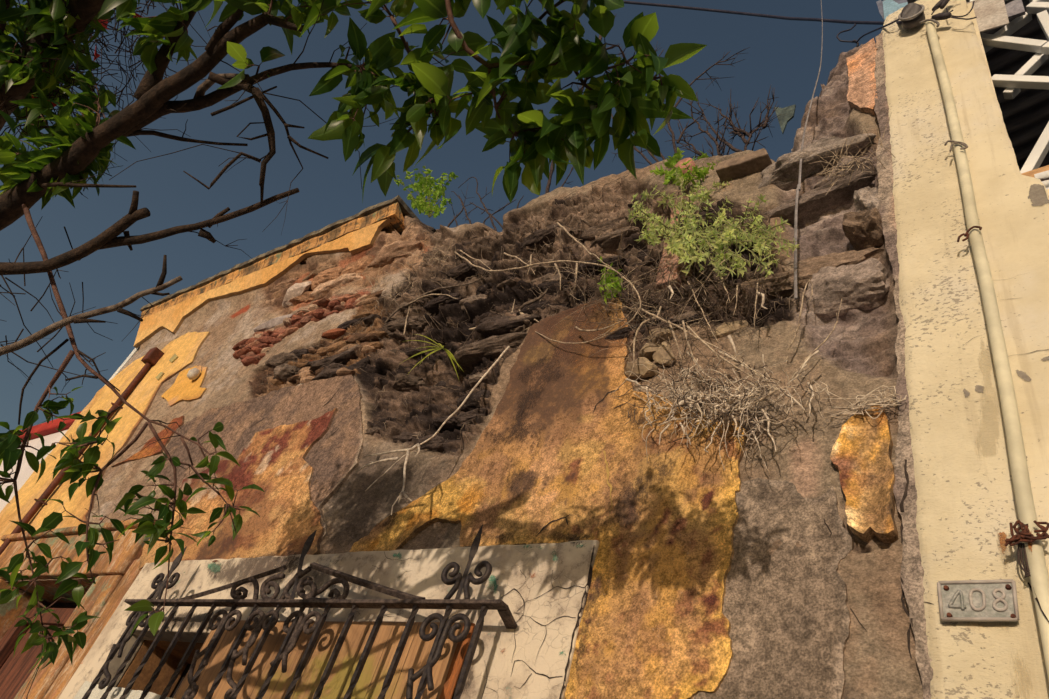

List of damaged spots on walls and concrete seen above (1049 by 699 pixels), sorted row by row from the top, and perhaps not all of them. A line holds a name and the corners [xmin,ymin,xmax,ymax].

flaking render [0,355,145,546]
flaking render [28,332,210,531]
flaking render [111,38,917,699]
crack [481,514,594,699]